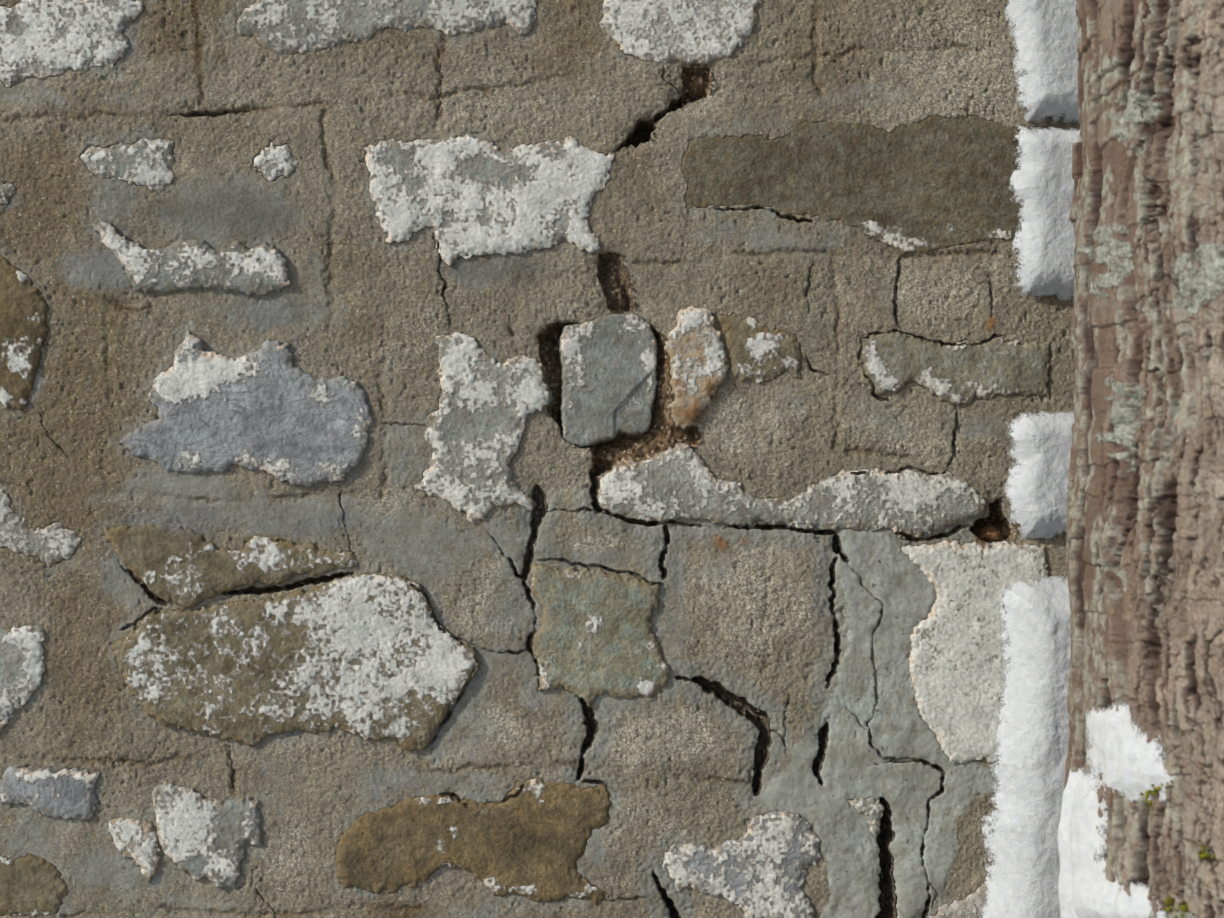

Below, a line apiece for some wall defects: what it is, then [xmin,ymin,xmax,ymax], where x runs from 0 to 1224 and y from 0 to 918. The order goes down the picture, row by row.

crack [617,67,685,151]
crack [223,491,351,595]
crack [118,567,167,630]
crack [409,469,945,918]